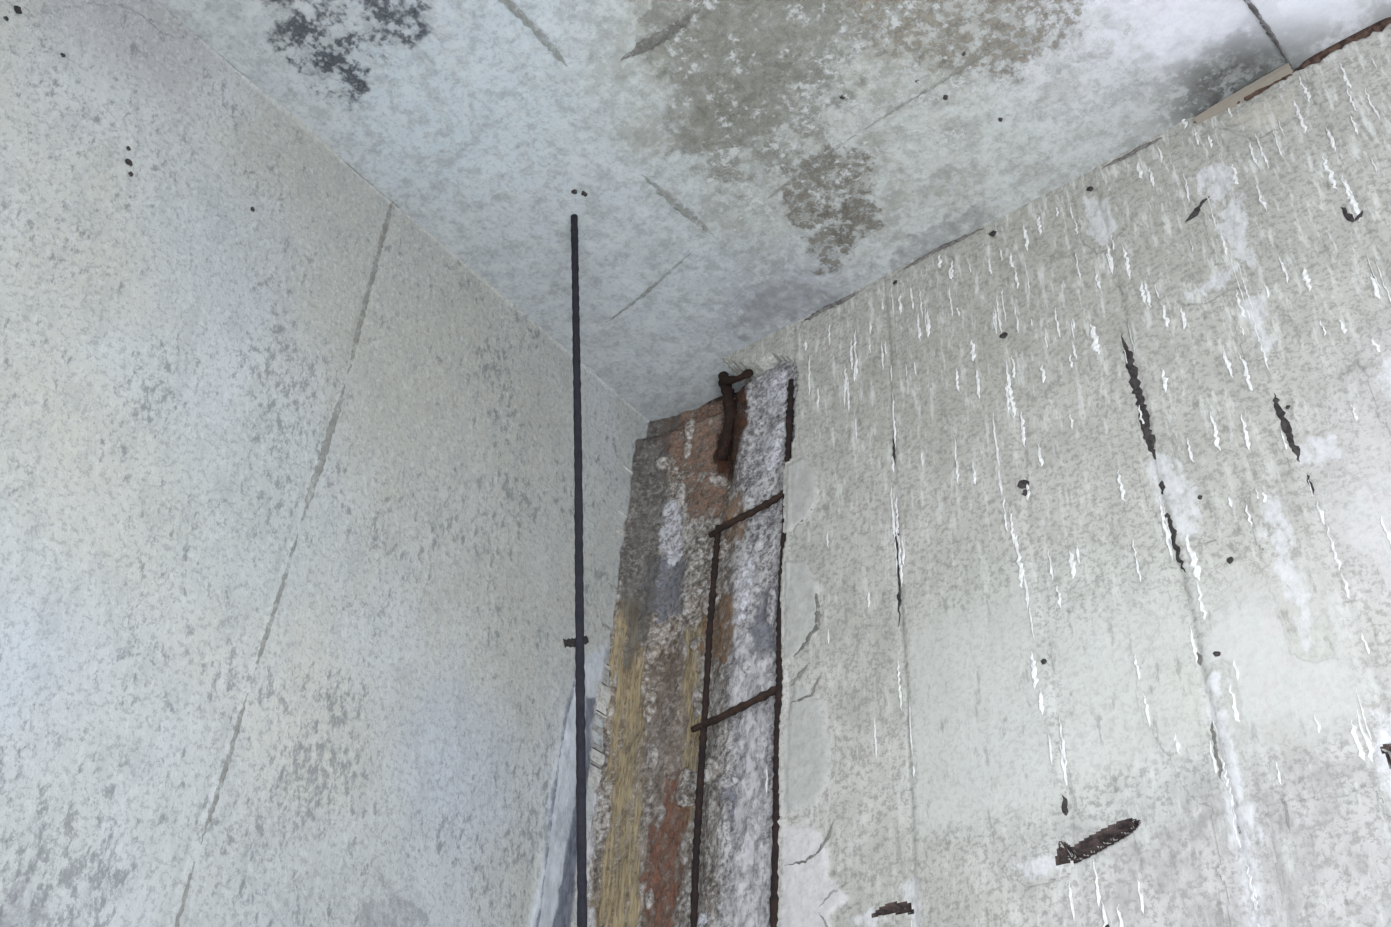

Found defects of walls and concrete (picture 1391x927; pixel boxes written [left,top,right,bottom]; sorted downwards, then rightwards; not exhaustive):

crack [1237,0,1391,104]
water stain [724,119,1312,409]
corrosion [654,381,751,549]
crack [1121,333,1185,572]
crack [1274,393,1314,495]
spalling [586,360,858,927]
water stain [1117,438,1293,927]
water stain [1350,690,1391,816]
water stain [840,866,931,927]
spalling [871,901,914,918]
water stain [1003,844,1075,920]
spalling [1055,818,1141,866]